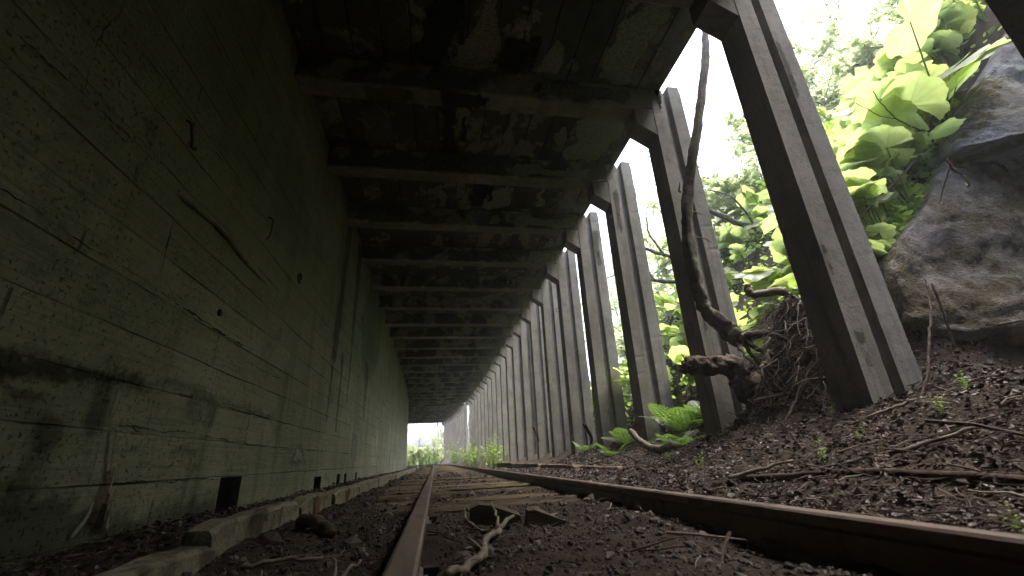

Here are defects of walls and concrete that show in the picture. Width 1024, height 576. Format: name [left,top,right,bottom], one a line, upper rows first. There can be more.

peeling [445,0,502,73]
crack [0,188,289,384]